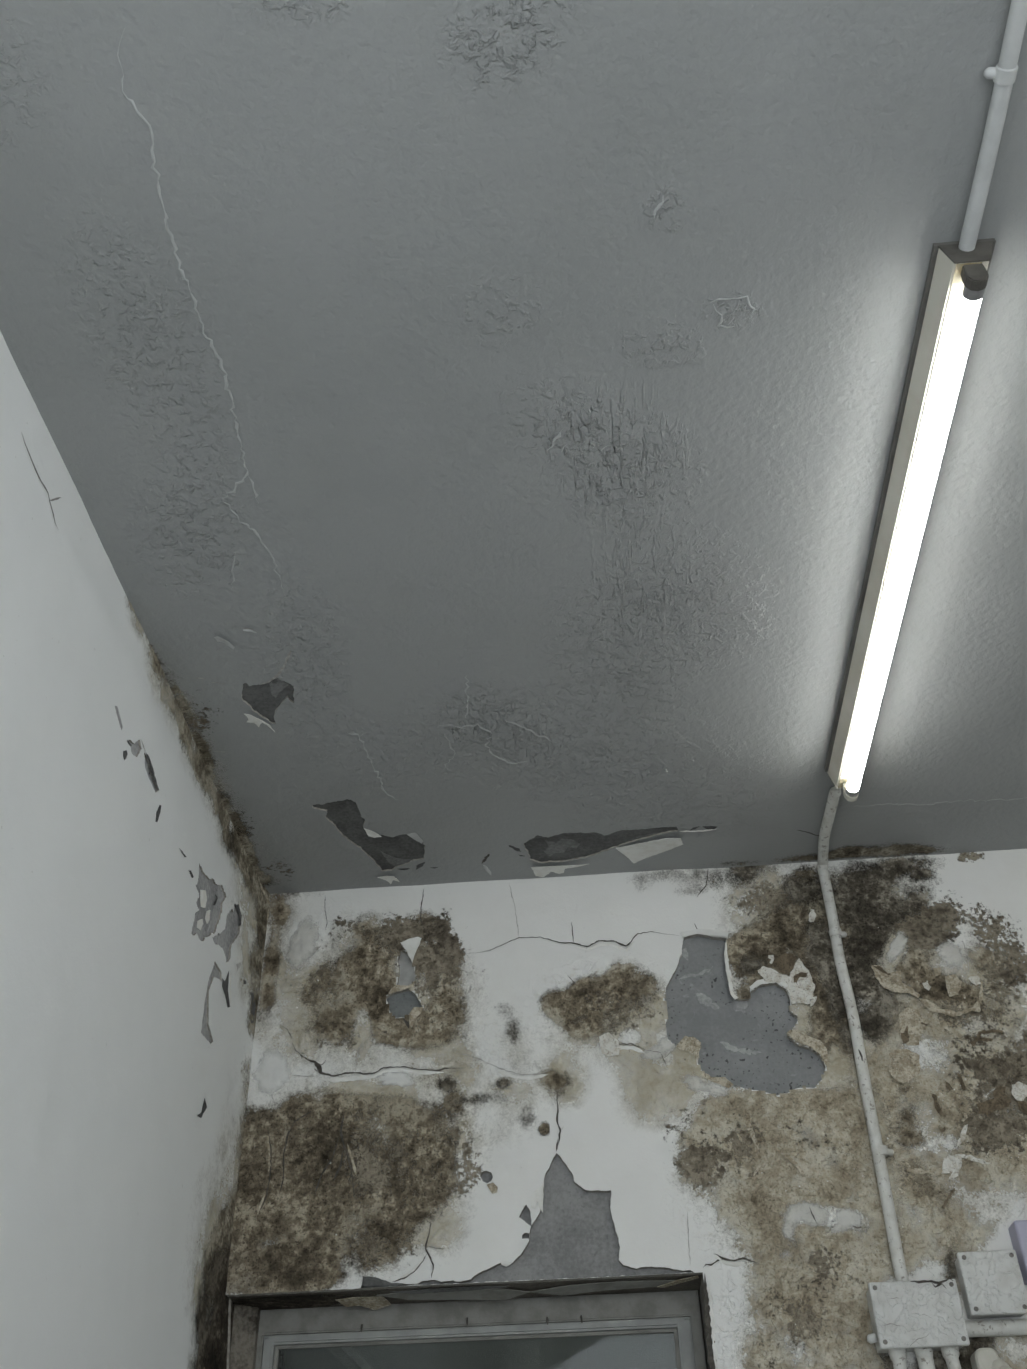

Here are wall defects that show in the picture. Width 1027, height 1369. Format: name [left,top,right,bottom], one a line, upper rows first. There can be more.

crack [22,435,61,529]
peeling [242,650,294,732]
peeling [313,799,438,884]
peeling [509,826,716,877]
peeling [179,848,256,1042]
water stain [128,601,1027,1369]
crack [477,854,708,983]
flaking render [642,929,828,1096]
crack [284,1027,561,1146]
flaking render [336,1140,699,1310]